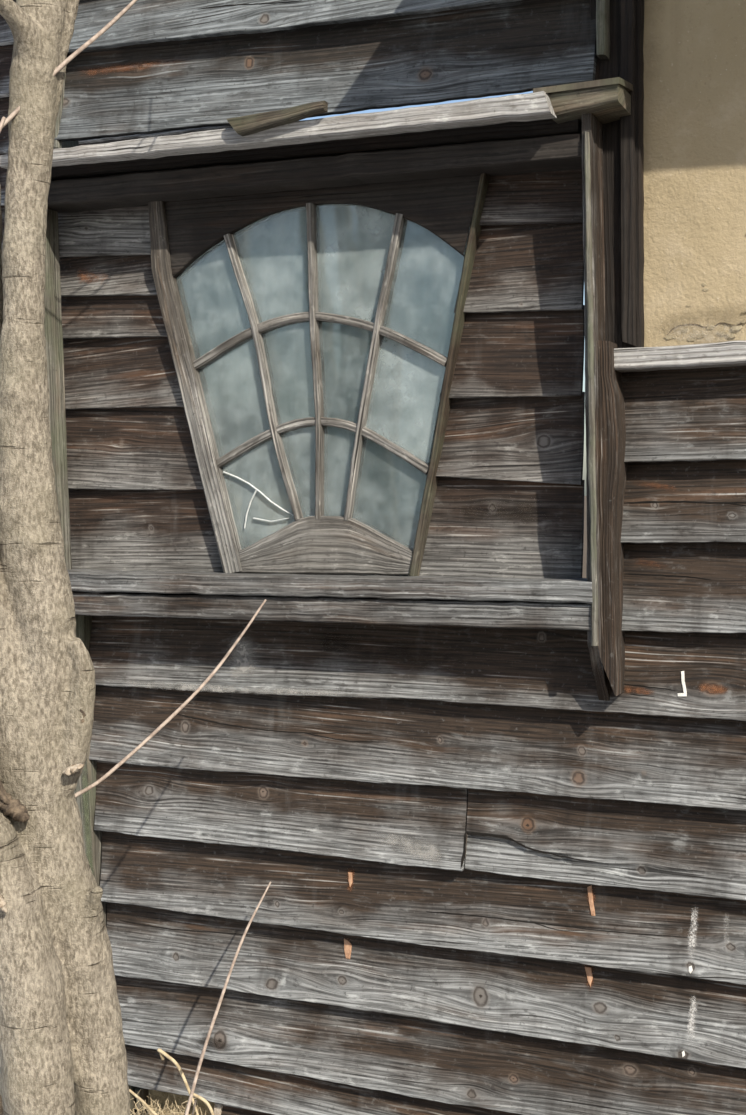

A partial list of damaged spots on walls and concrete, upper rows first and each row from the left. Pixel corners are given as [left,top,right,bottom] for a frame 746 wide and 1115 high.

crack [461,832,602,867]